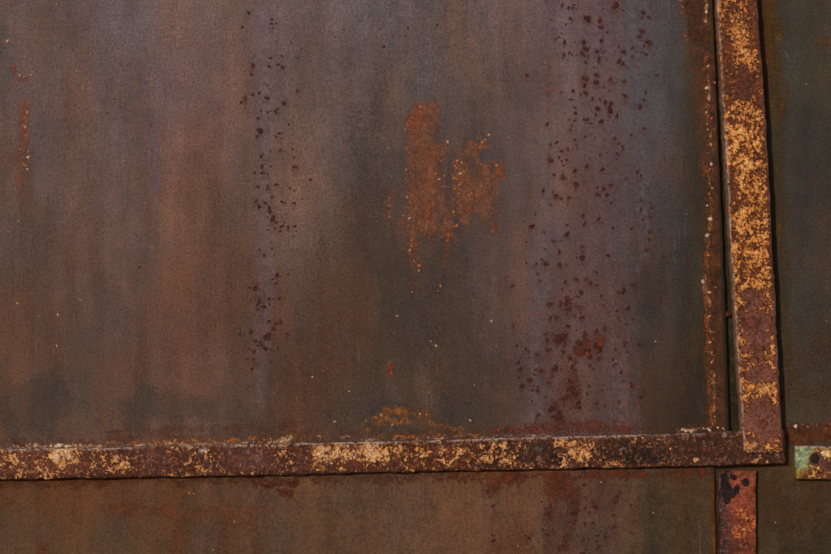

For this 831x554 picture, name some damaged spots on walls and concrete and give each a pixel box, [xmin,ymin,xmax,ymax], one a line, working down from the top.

rust [731,0,796,407]
rust [0,331,707,502]